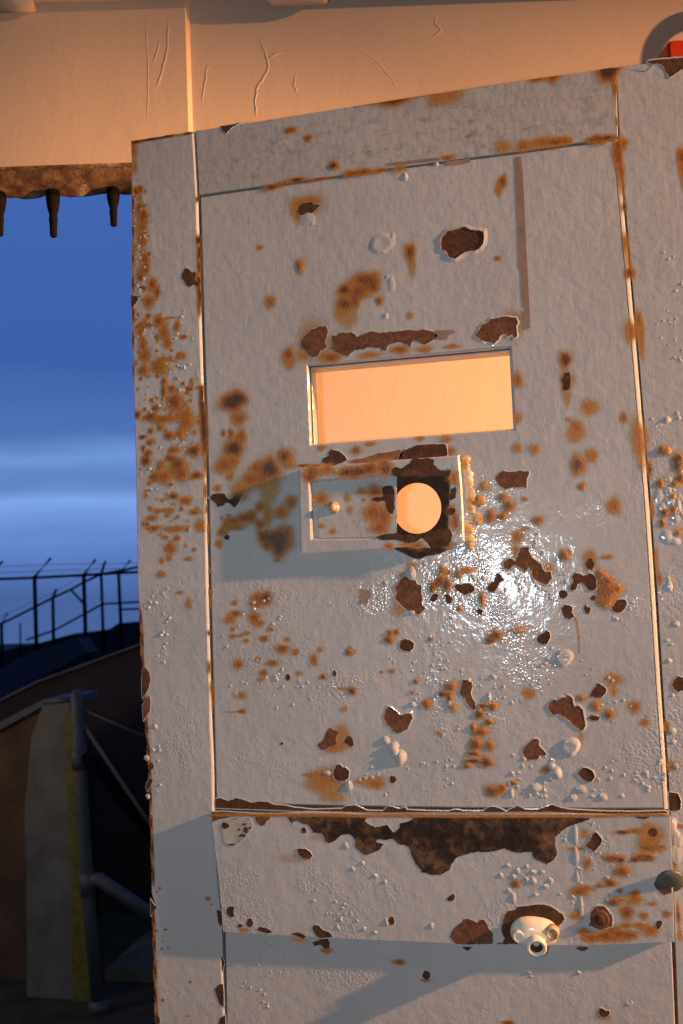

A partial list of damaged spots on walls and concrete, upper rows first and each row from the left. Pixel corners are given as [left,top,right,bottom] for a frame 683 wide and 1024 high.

crack [254,40,284,119]
peeling [436,223,488,263]
peeling [472,157,530,346]
peeling [297,324,455,360]
corrosion [131,185,431,577]
peeling [321,443,455,514]
peeling [377,529,452,560]
corrosion [444,505,460,549]
peeling [392,545,597,620]
peeling [210,791,682,877]
corrosion [211,813,683,943]
peeling [449,902,566,951]